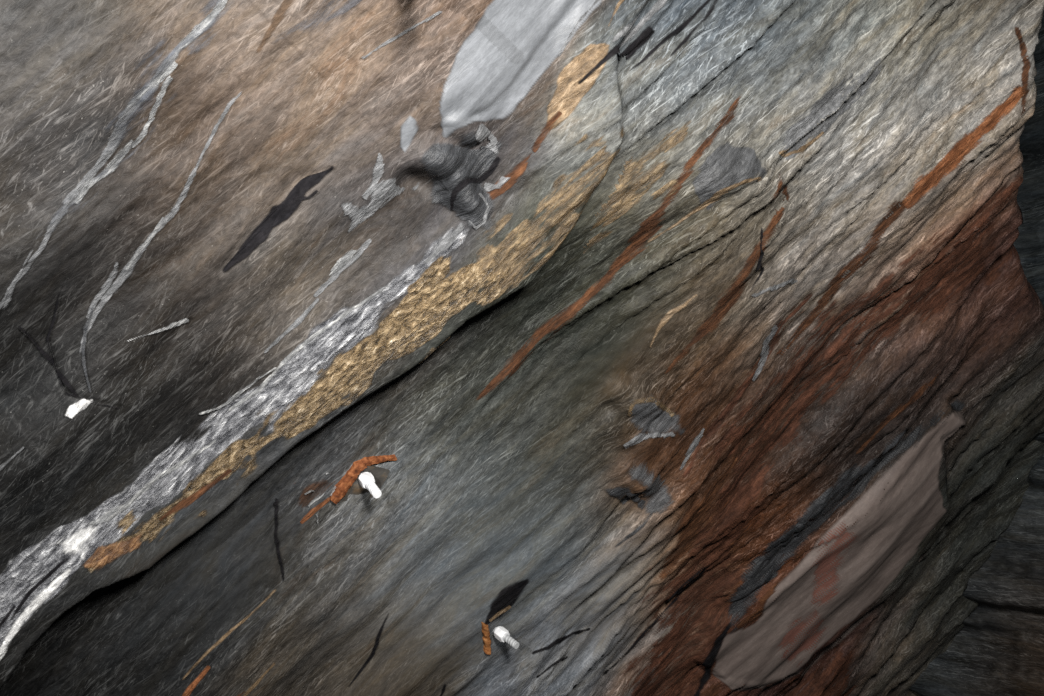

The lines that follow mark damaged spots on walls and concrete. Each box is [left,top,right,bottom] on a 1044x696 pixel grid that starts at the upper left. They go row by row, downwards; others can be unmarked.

crack [223,166,334,272]
rust [300,460,367,524]
rust [481,622,491,655]